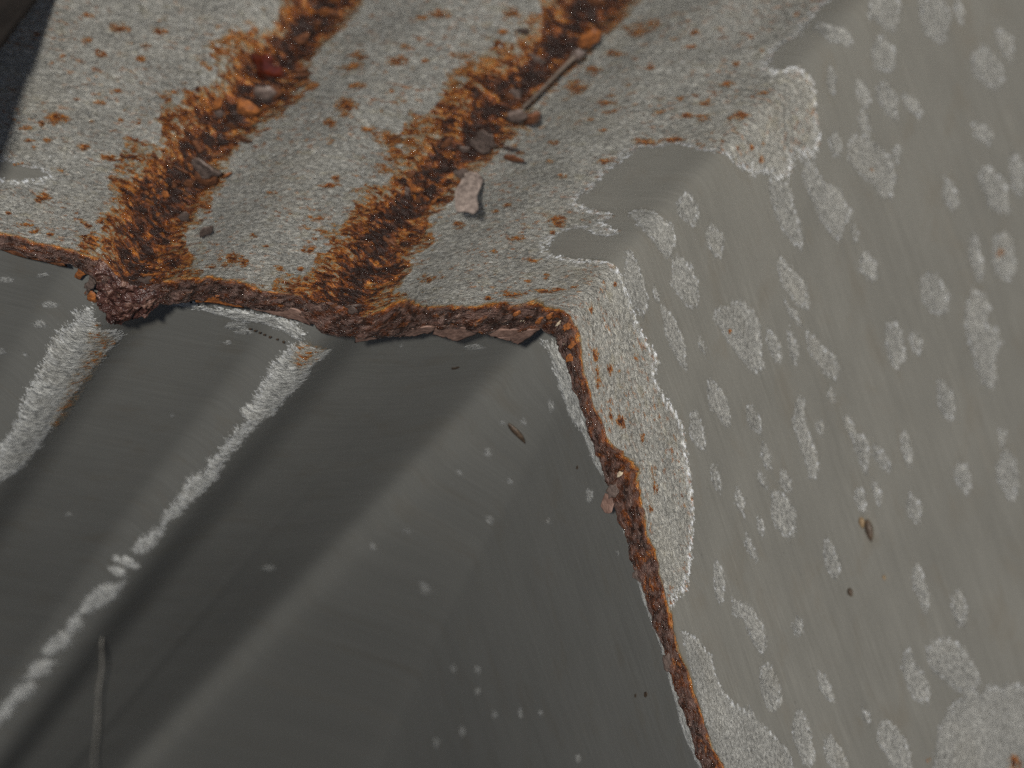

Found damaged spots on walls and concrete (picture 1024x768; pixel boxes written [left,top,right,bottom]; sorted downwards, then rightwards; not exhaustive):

leakage [0,286,127,483]
peeling [74,268,98,303]
peeling [0,0,309,268]
leakage [0,340,334,724]
peeling [150,0,569,295]
rust [0,0,816,768]
peeling [366,0,831,610]